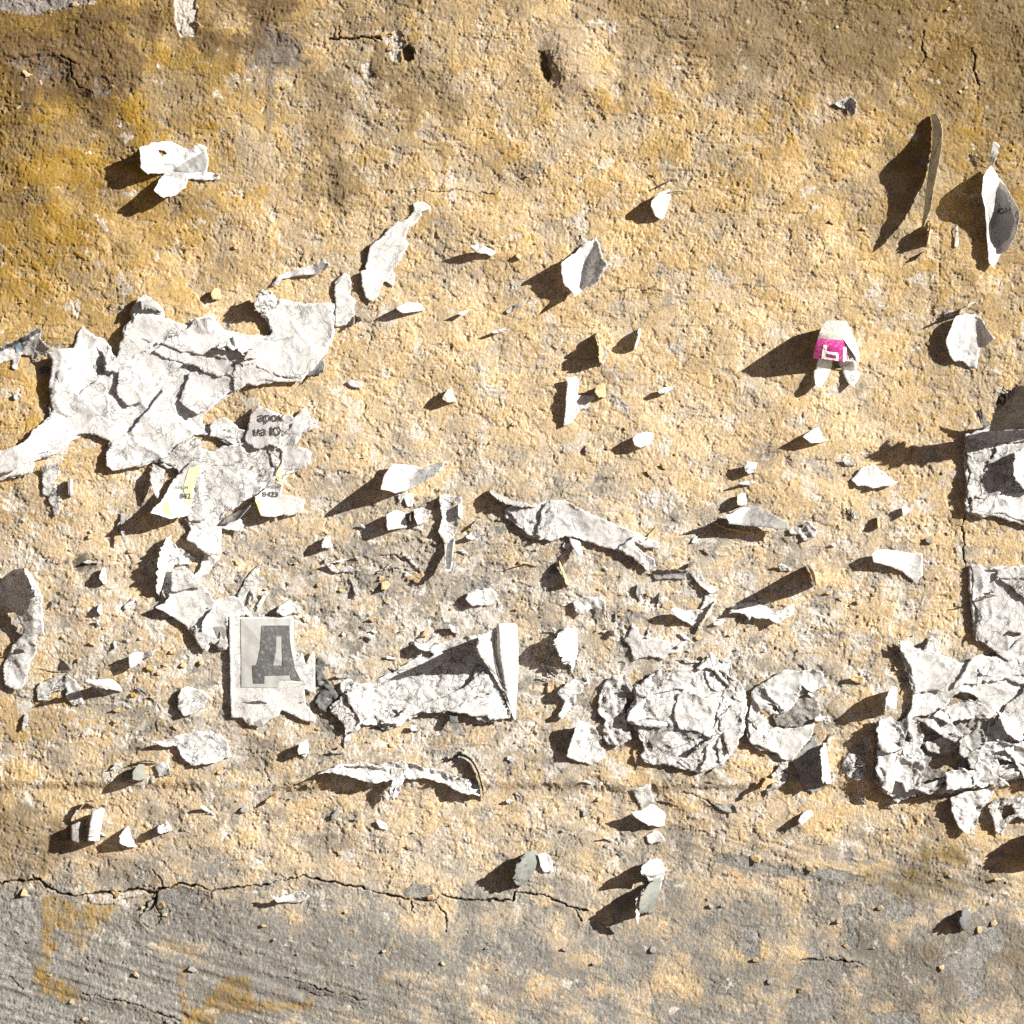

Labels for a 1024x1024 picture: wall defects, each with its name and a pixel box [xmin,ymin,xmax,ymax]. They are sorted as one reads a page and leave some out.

peeling [211,288,222,300]
crack [0,875,588,932]